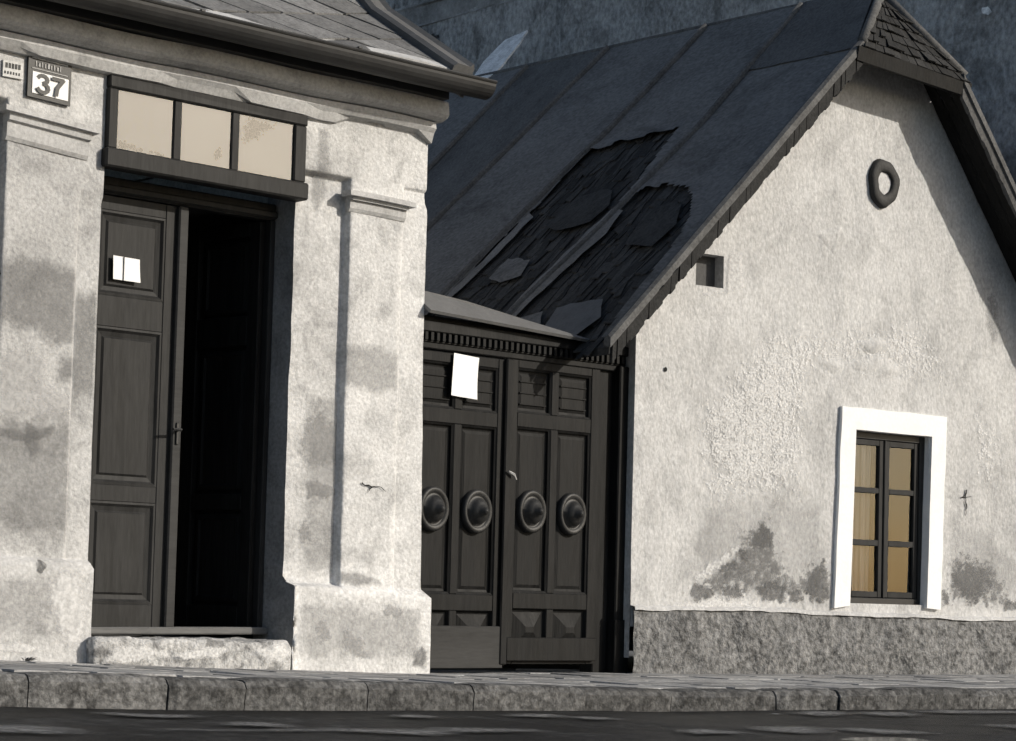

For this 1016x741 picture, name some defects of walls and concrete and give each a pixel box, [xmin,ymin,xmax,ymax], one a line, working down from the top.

leakage [2,261,98,397]
peeling [678,518,830,607]
flaking render [942,555,1016,611]